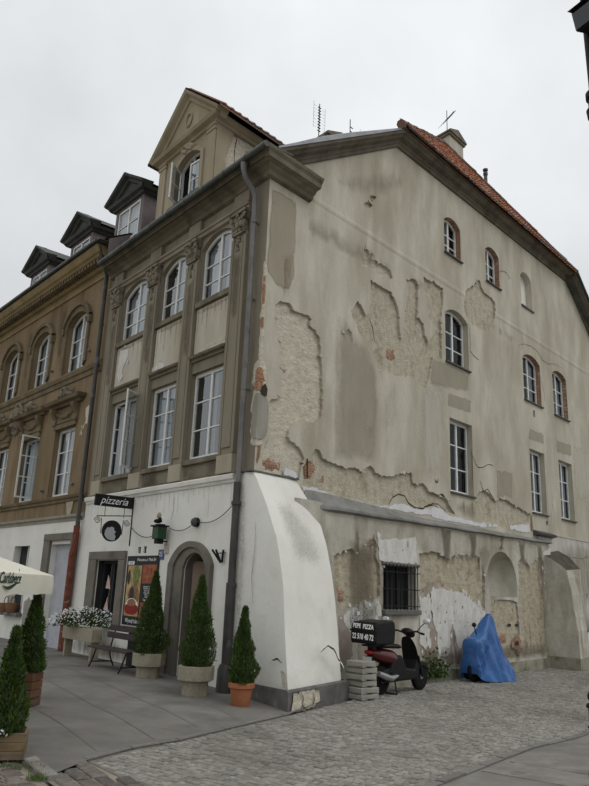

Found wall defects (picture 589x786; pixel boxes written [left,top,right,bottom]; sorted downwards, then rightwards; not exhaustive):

spalling [225,133,254,168]
flaking render [117,345,129,382]
spalling [250,248,452,513]
spalling [475,490,528,528]
peeling [333,532,551,673]